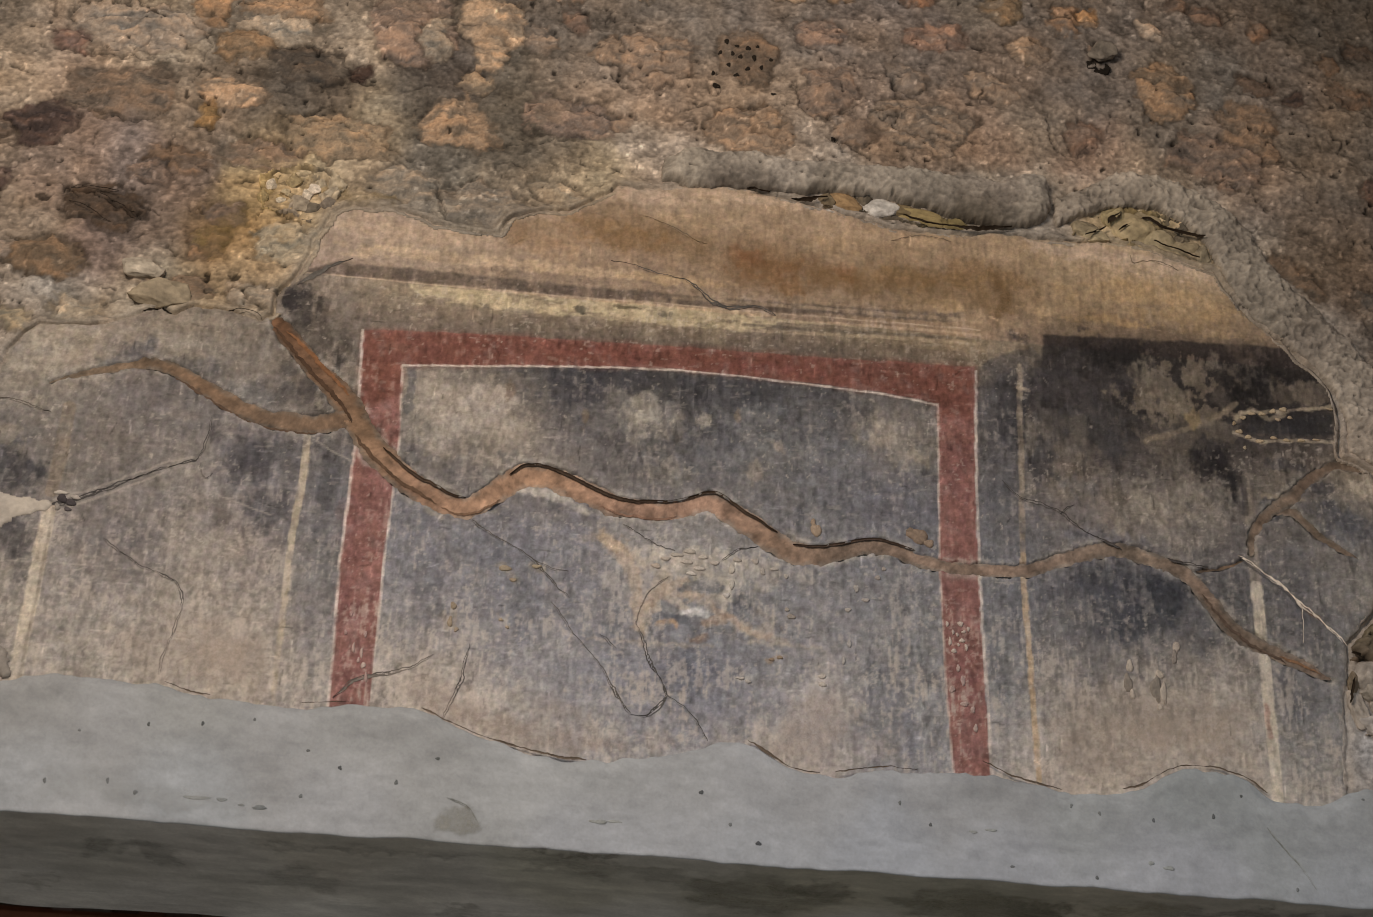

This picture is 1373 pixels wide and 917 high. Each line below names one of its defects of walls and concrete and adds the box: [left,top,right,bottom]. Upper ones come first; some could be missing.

spalling [1070,207,1214,264]
crack [297,258,353,285]
crack [0,308,1362,741]
crack [302,644,586,760]
spalling [1346,651,1373,738]
crack [748,740,917,773]
crack [983,761,1062,790]
crack [1123,764,1267,793]